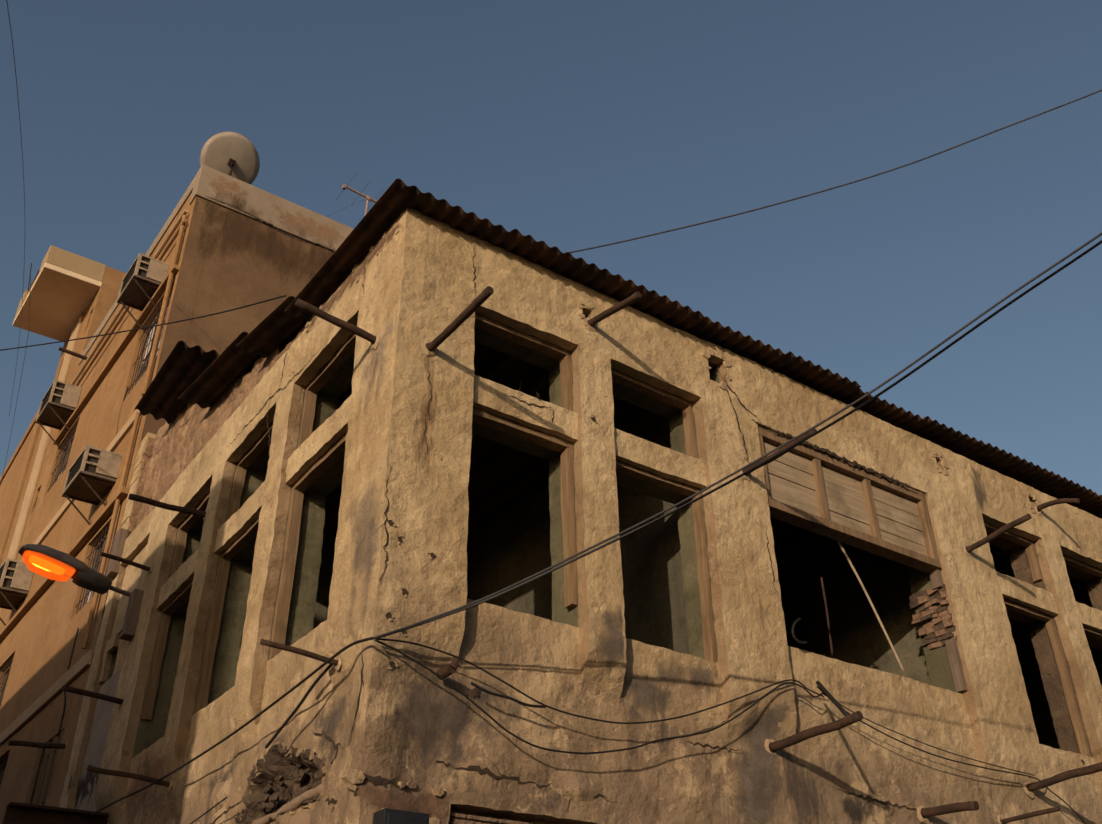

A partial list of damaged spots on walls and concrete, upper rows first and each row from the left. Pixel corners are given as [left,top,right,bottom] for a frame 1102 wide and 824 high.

crack [408,355,442,461]
crack [717,367,926,493]
crack [370,465,392,586]
spalling [909,584,958,650]
spalling [234,743,328,824]